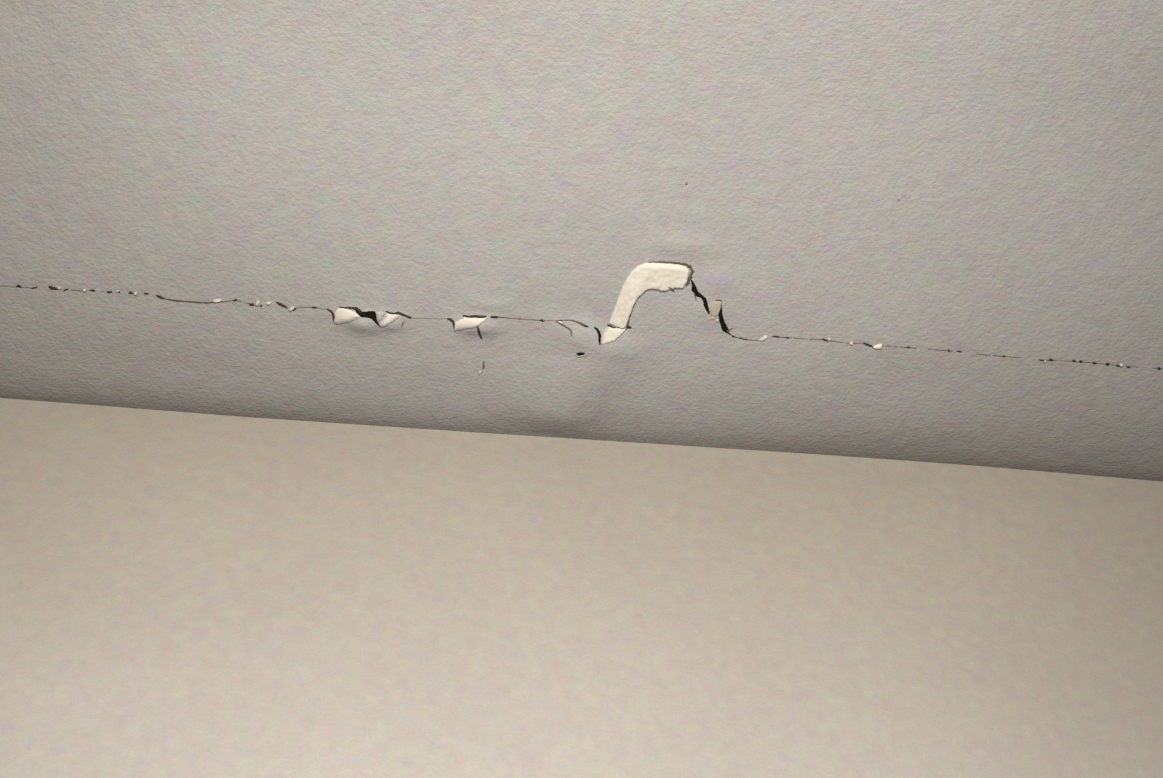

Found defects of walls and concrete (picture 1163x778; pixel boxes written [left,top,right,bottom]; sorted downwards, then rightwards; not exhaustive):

crack [0,284,327,311]
peeling [318,274,535,362]
crack [498,300,639,361]
peeling [582,194,810,359]
crack [691,279,1163,370]